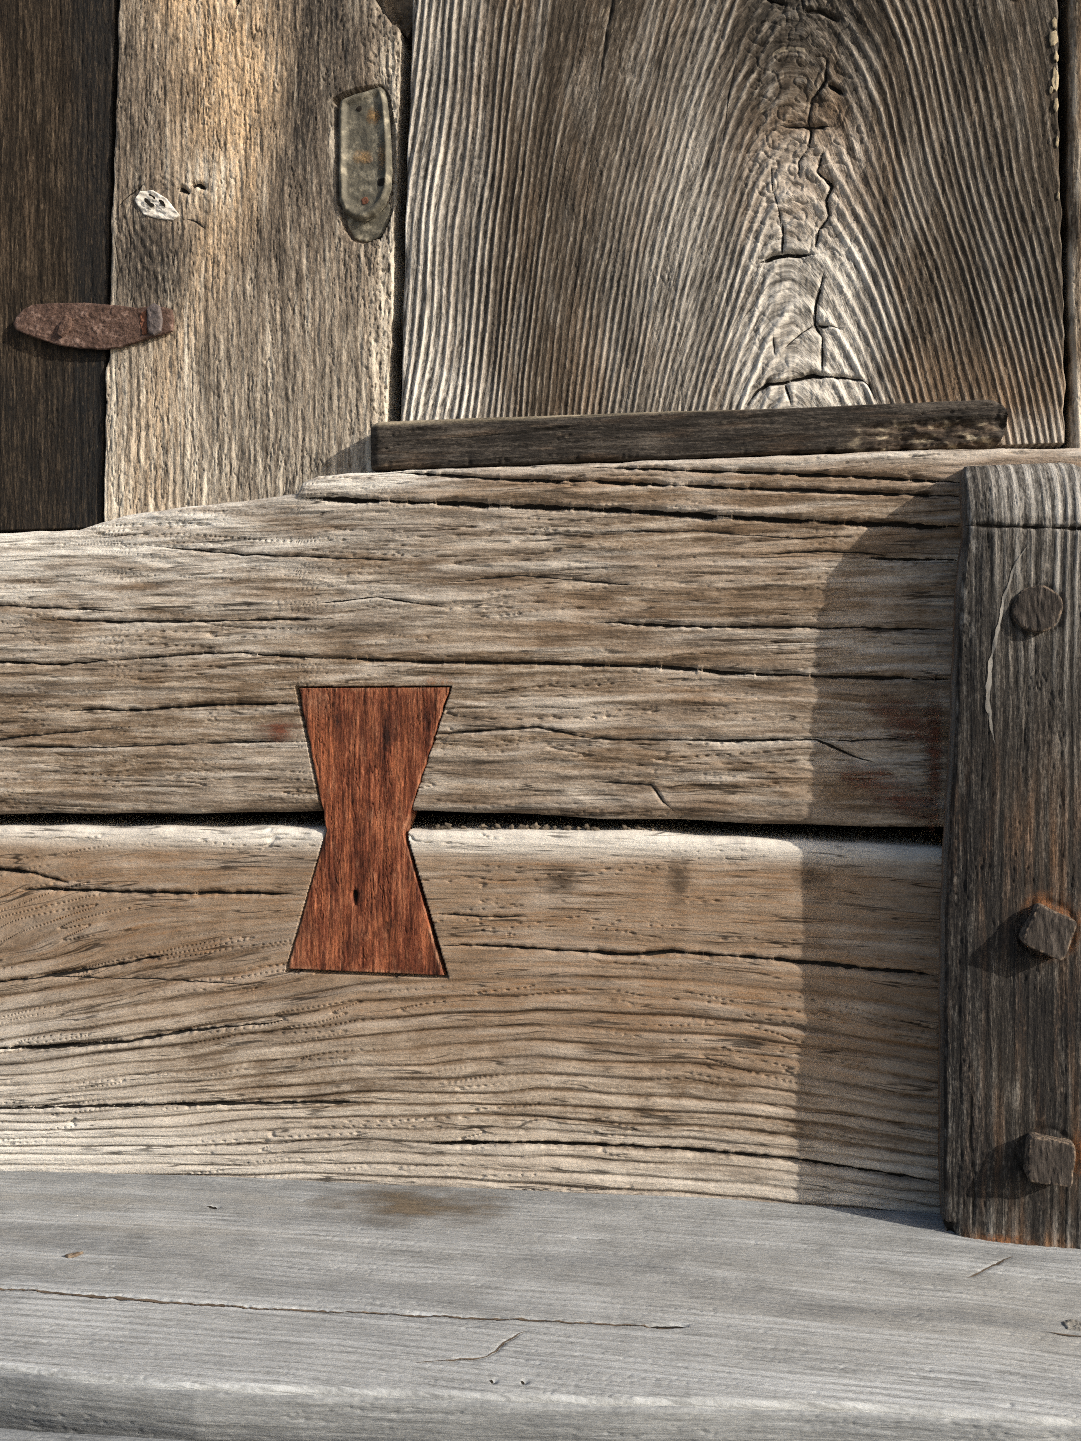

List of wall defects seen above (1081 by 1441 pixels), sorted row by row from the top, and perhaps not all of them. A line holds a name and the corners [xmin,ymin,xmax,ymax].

crack [767,0,836,22]
crack [747,64,875,405]
crack [0,1288,684,1363]